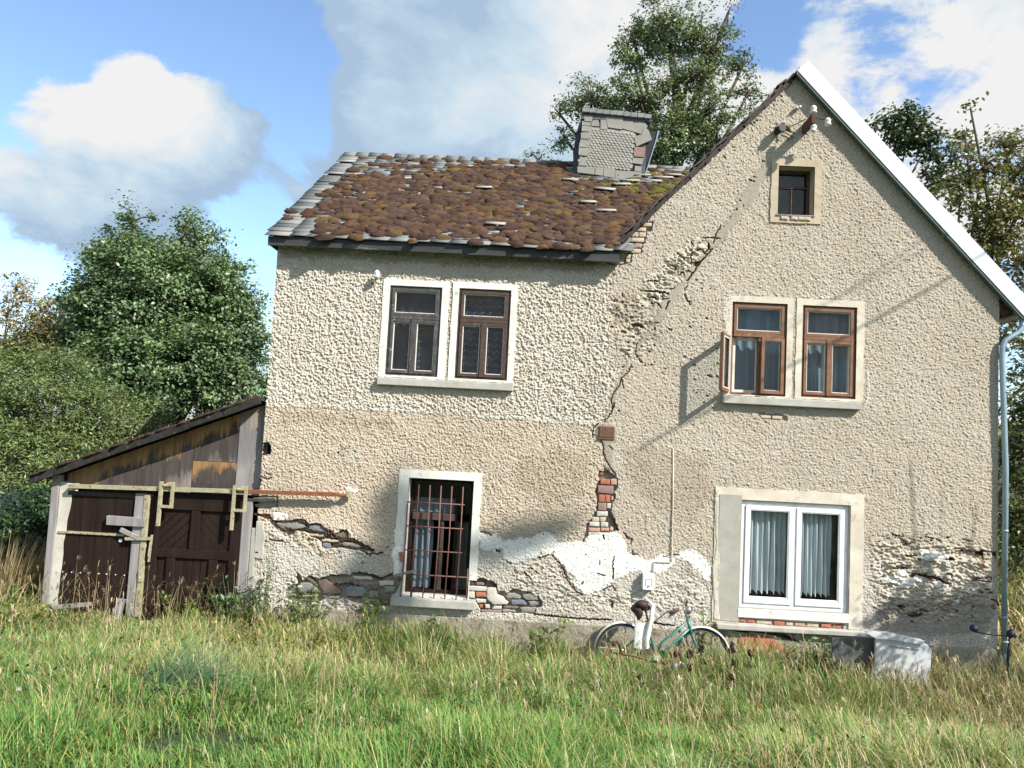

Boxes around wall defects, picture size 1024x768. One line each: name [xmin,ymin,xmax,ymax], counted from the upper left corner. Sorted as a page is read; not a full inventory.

crack [641,225,721,310]
crack [592,343,642,476]
flaking render [584,470,617,537]
flaking render [251,495,401,607]
flaking render [469,579,542,613]
flaking render [884,534,954,610]